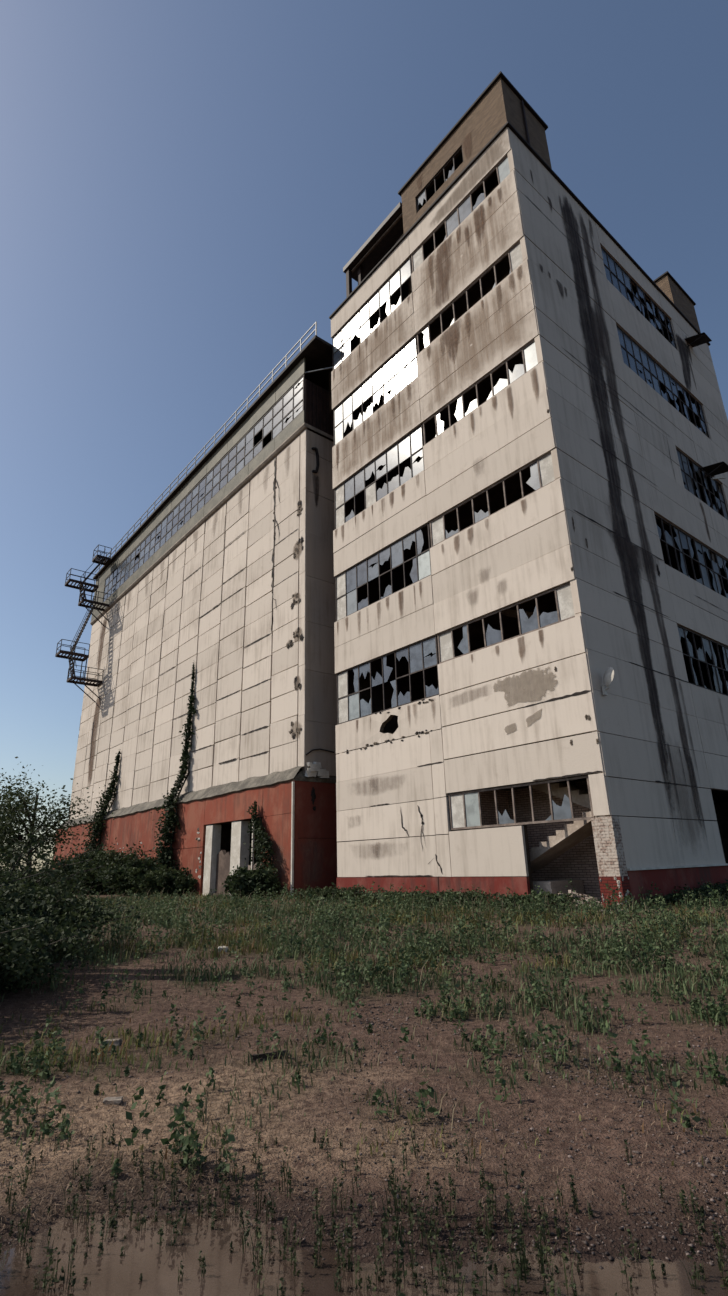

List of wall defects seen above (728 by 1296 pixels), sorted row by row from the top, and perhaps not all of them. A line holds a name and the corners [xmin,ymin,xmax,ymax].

water stain [450,189,501,277]
water stain [333,317,402,388]
water stain [427,266,522,397]
water stain [336,386,409,472]
water stain [492,387,513,413]
water stain [540,196,705,828]
water stain [519,630,543,657]
peeling [493,666,557,735]
crack [368,803,443,877]